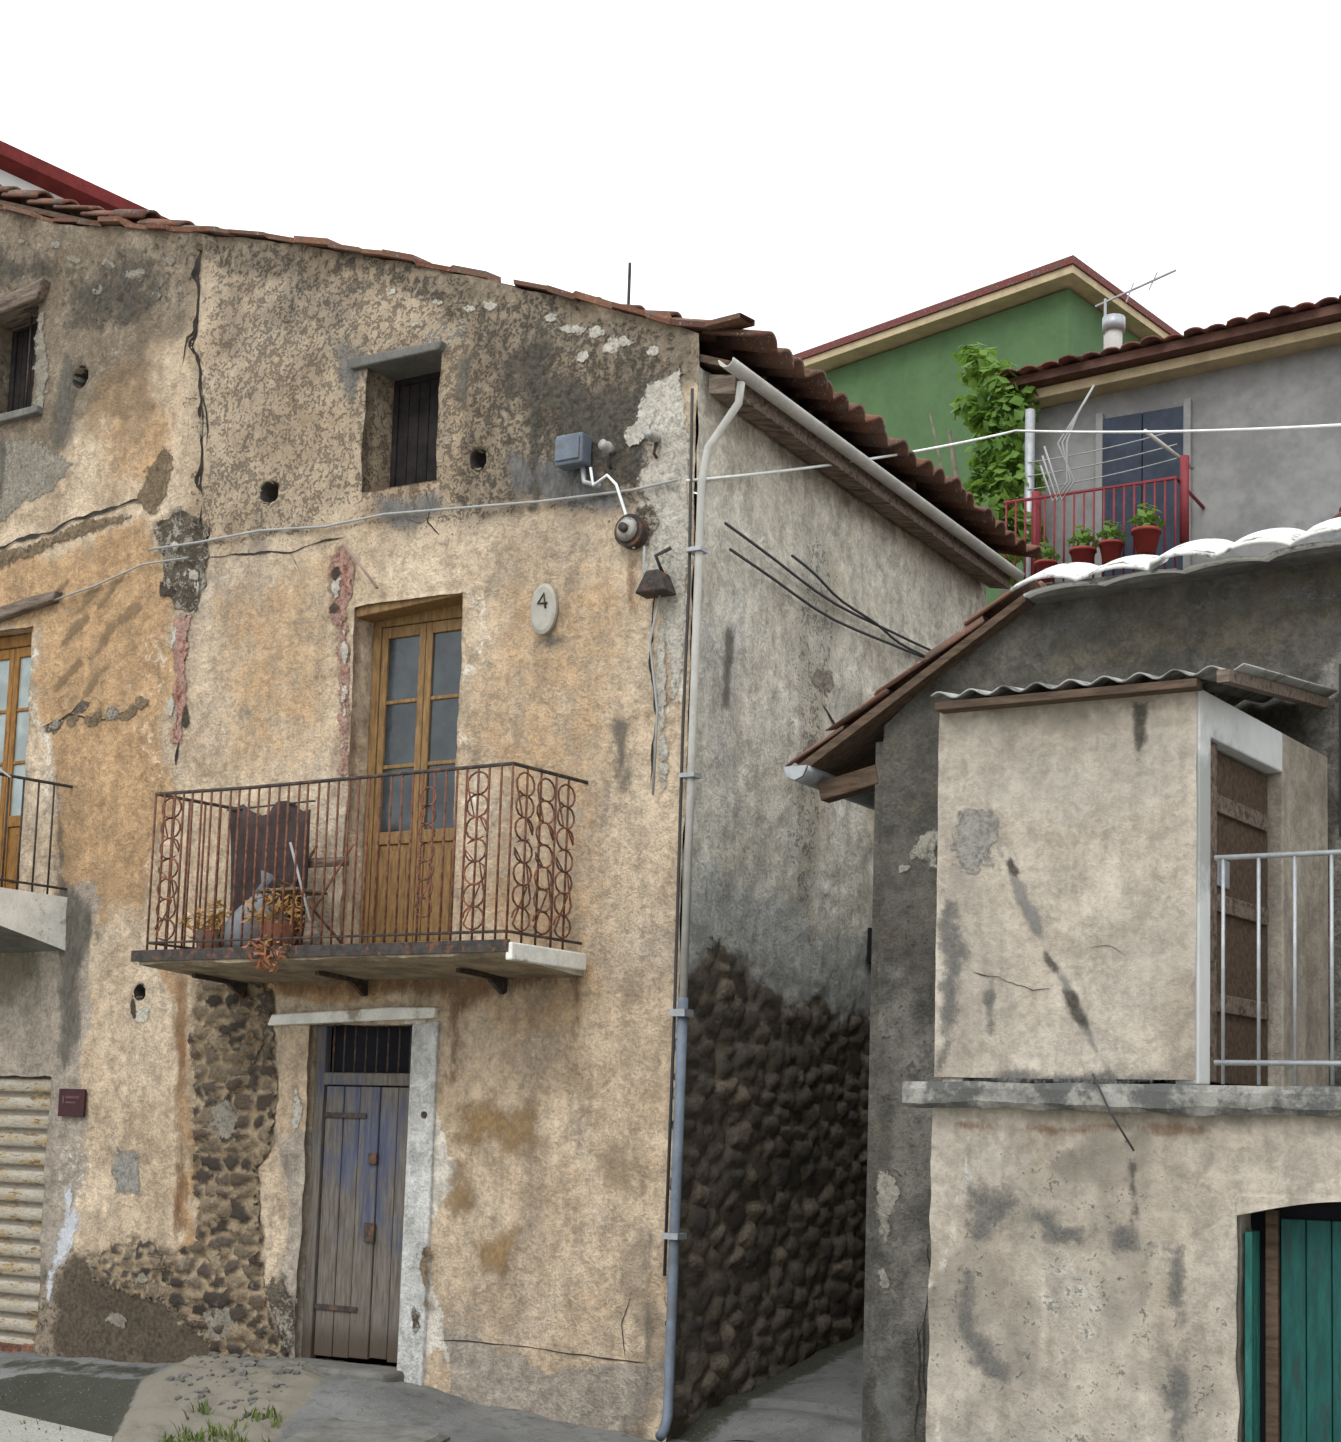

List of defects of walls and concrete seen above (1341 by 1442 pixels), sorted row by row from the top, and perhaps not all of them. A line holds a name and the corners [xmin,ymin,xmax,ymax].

peeling [32,311,50,408]
peeling [544,313,659,362]
crack [182,250,344,664]
spalling [0,437,209,744]
peeling [624,368,690,789]
crack [44,702,122,727]
crack [173,718,181,765]
spalling [49,979,303,1364]
water stain [462,1104,534,1151]
water stain [1032,1211,1083,1245]
water stain [958,1275,1010,1381]
water stain [1168,1247,1185,1323]